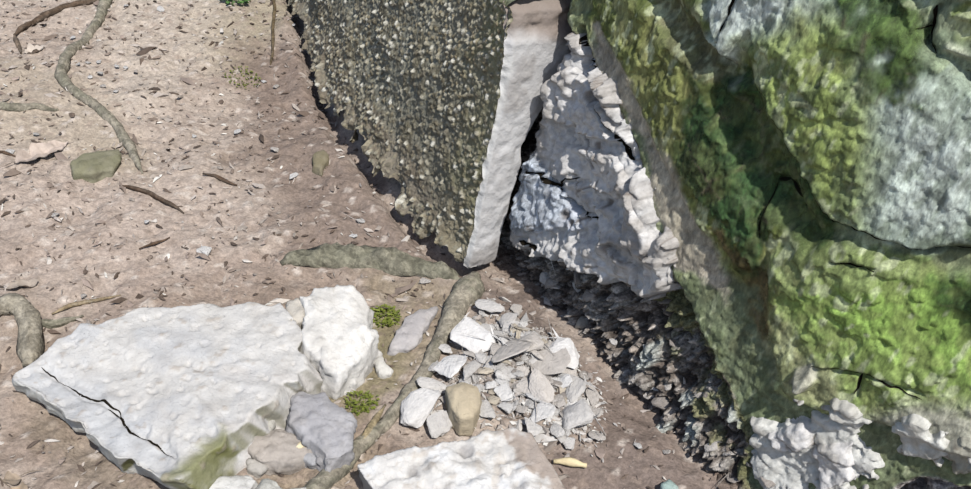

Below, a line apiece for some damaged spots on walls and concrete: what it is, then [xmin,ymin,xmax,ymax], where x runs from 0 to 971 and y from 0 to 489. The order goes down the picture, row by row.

crack [717,0,735,38]